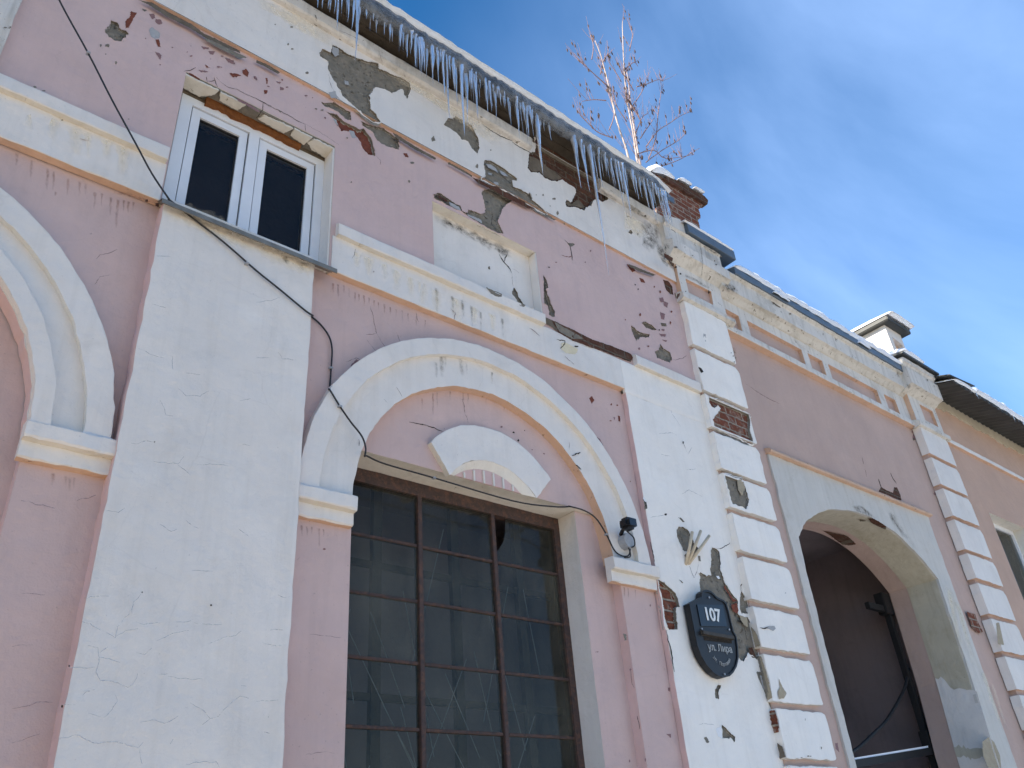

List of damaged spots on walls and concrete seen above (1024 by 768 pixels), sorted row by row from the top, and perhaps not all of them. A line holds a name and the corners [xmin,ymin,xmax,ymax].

peeling [100,0,288,94]
spalling [305,44,436,164]
spalling [432,115,607,236]
spalling [542,264,686,363]
spalling [707,395,754,446]
spalling [722,472,749,509]
spalling [878,475,901,500]
crack [66,592,243,748]
spalling [650,518,787,759]